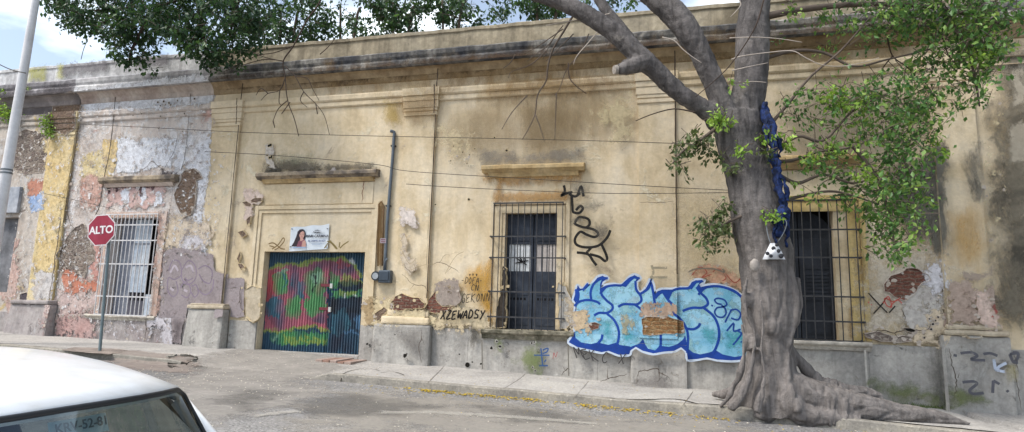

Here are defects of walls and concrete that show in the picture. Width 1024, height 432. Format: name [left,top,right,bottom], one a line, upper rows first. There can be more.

peeling [0,73,225,344]
peeling [398,206,420,276]
peeling [361,256,528,351]
spalling [620,301,685,336]
peeling [853,241,1003,349]
water stain [963,43,1024,326]